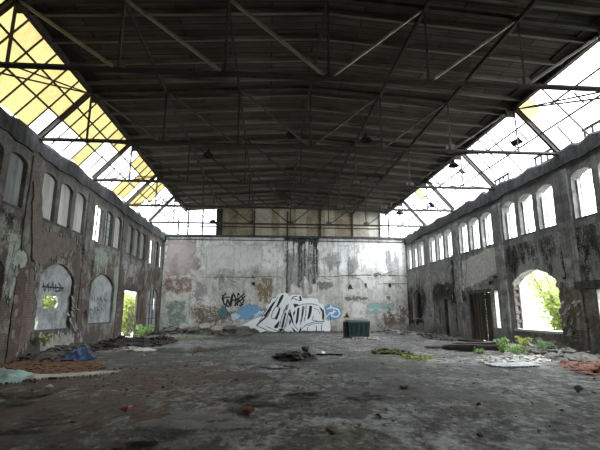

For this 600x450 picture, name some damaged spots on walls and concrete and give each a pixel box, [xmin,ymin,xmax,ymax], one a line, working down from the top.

flaking render [5,182,88,358]
damp [284,238,380,301]
damp [504,234,567,292]
damp [575,222,600,281]